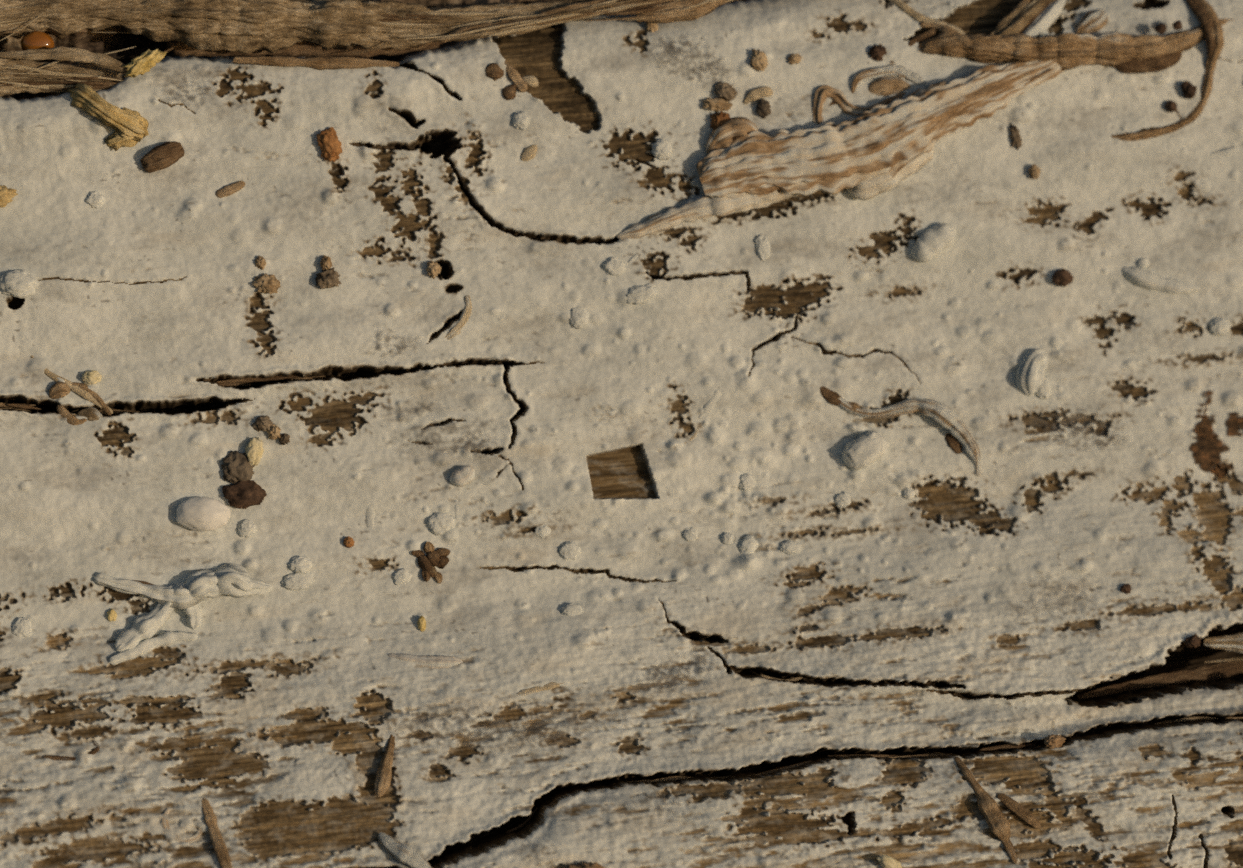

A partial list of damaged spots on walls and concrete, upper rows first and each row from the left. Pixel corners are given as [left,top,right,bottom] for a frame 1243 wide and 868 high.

peeling [358,149,445,268]
crack [349,107,620,245]
peeling [492,24,700,197]
crack [0,310,545,491]
crack [646,270,751,292]
crack [748,314,921,384]
peeling [909,470,1094,536]
peeling [1055,464,1243,632]
crack [480,565,1085,701]
peeling [0,646,432,868]
crack [427,713,1243,868]
peeling [657,752,1177,868]